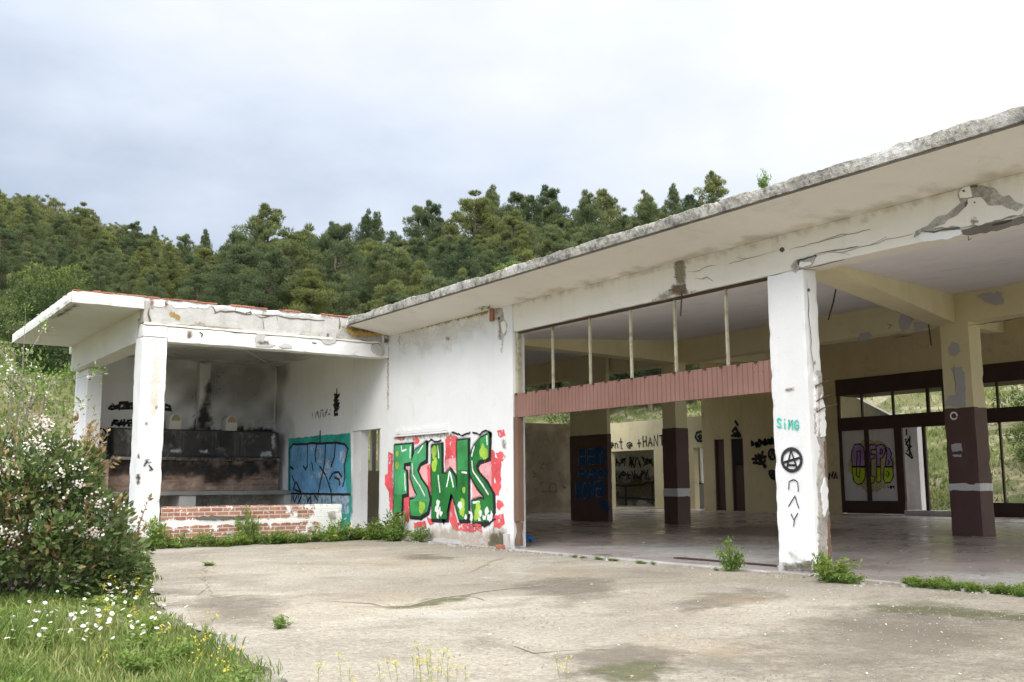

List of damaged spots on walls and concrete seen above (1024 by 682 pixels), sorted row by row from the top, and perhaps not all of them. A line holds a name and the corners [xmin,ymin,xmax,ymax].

spalling [914,185,1024,242]
crack [182,306,341,329]
spalling [670,260,687,316]
spalling [791,254,817,273]
crack [694,227,960,369]
spalling [945,341,966,407]
spalling [782,370,837,571]